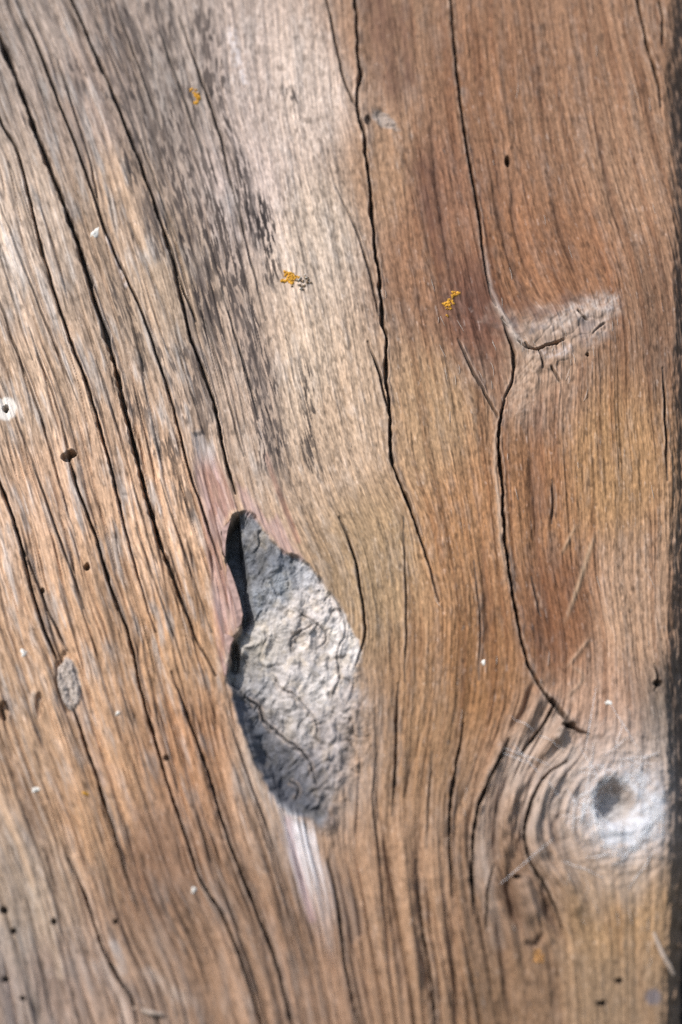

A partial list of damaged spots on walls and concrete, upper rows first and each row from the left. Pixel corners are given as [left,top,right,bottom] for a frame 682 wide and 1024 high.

crack [0,0,294,1024]
crack [240,517,367,801]
crack [325,0,441,602]
crack [447,0,589,929]